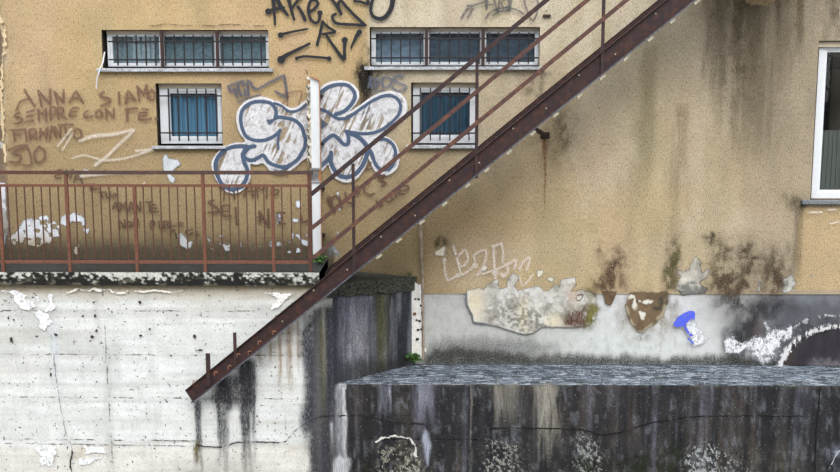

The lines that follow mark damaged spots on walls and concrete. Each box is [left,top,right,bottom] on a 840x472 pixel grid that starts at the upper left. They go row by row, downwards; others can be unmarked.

spalling [466,270,597,335]
leakage [593,250,623,290]
leakage [663,243,680,294]
peeling [675,256,710,296]
leakage [705,232,840,366]
leakage [212,360,256,457]
leakage [301,298,350,472]
crack [490,415,803,436]